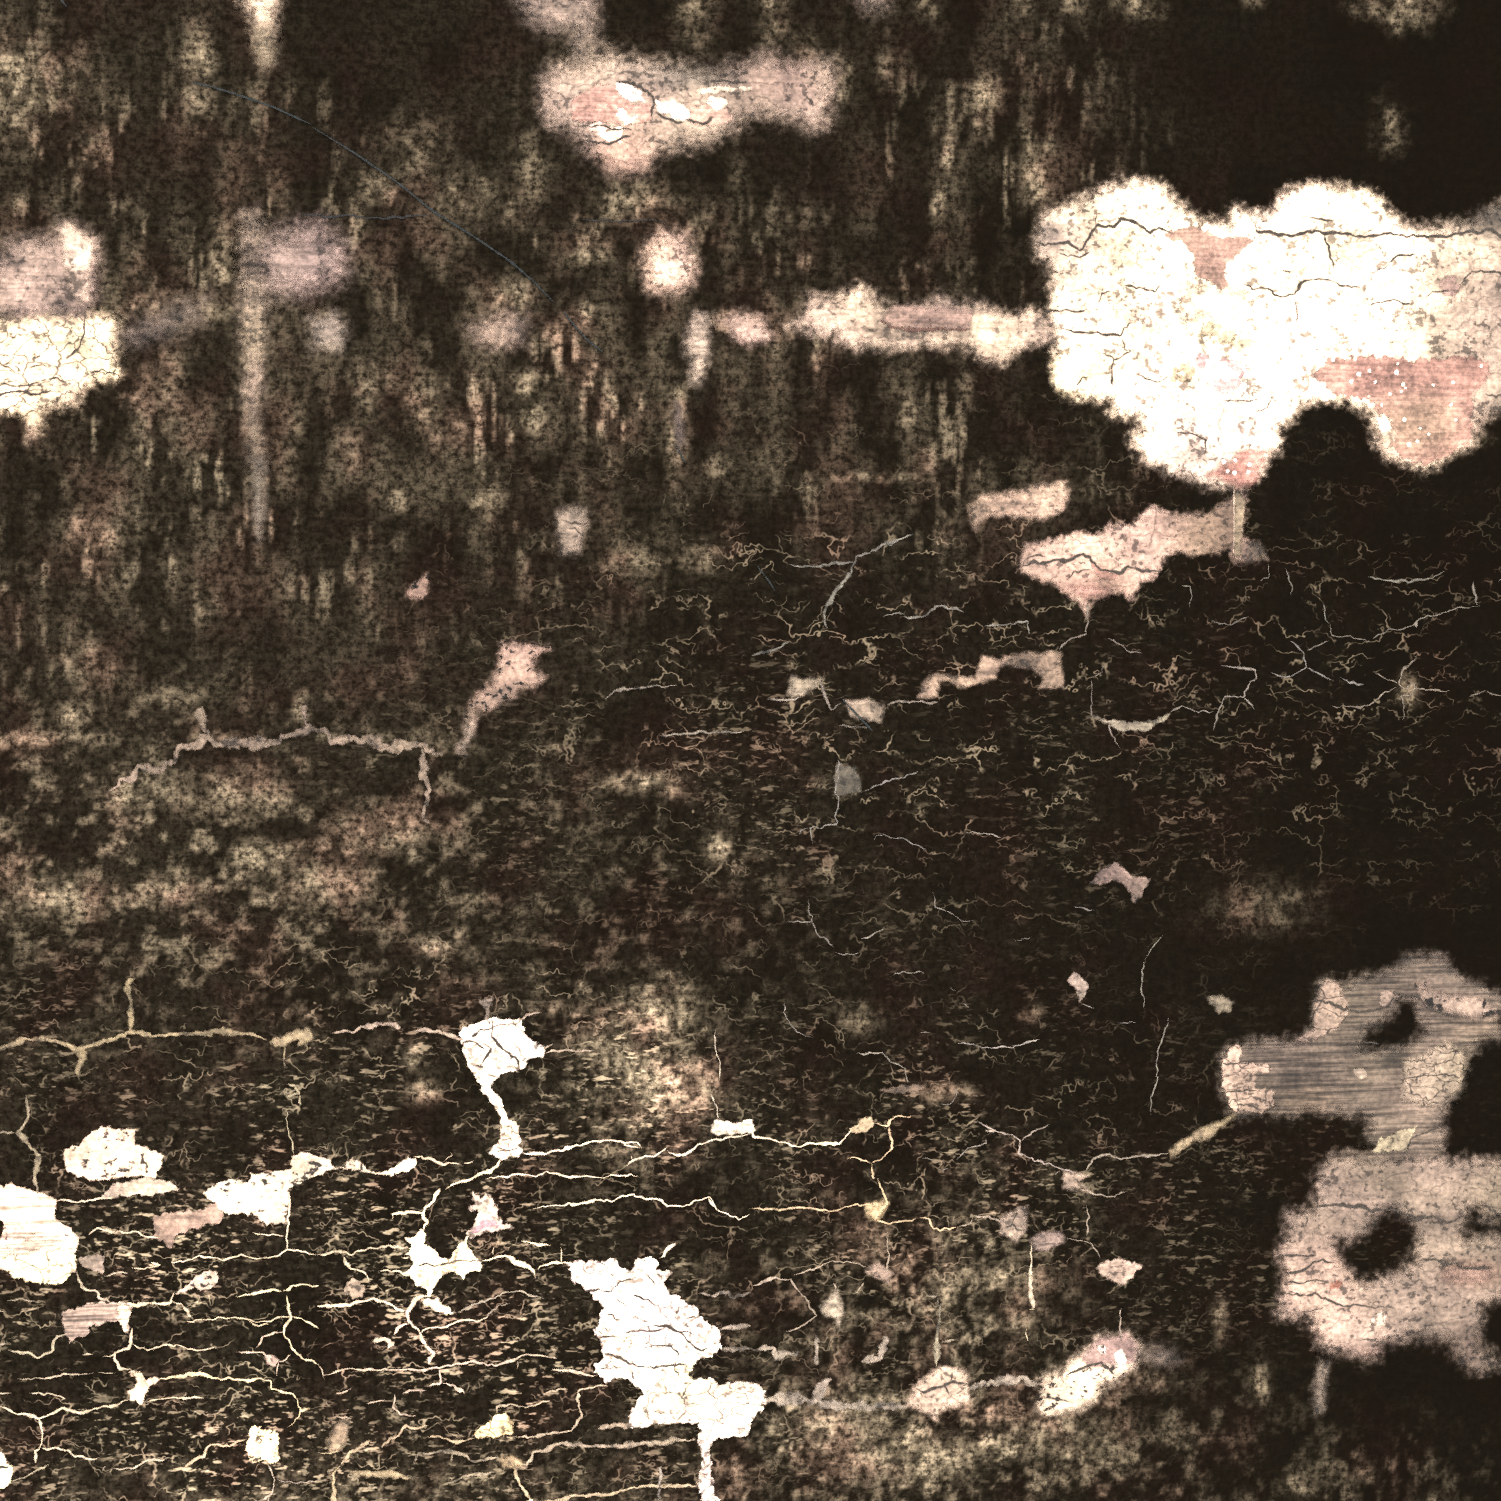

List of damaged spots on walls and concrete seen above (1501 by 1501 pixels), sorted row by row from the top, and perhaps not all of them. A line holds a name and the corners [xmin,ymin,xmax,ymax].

peeling [788,176,1501,612]
crack [885,553,1246,749]
crack [1171,564,1501,728]
crack [109,705,443,824]
crack [0,978,592,1154]
peeling [459,998,545,1160]
peeling [0,1183,105,1285]
peeling [63,1126,179,1198]
peeling [148,1152,416,1248]
crack [0,1032,1168,1501]
crack [1279,1202,1501,1344]
peeling [569,1257,767,1501]